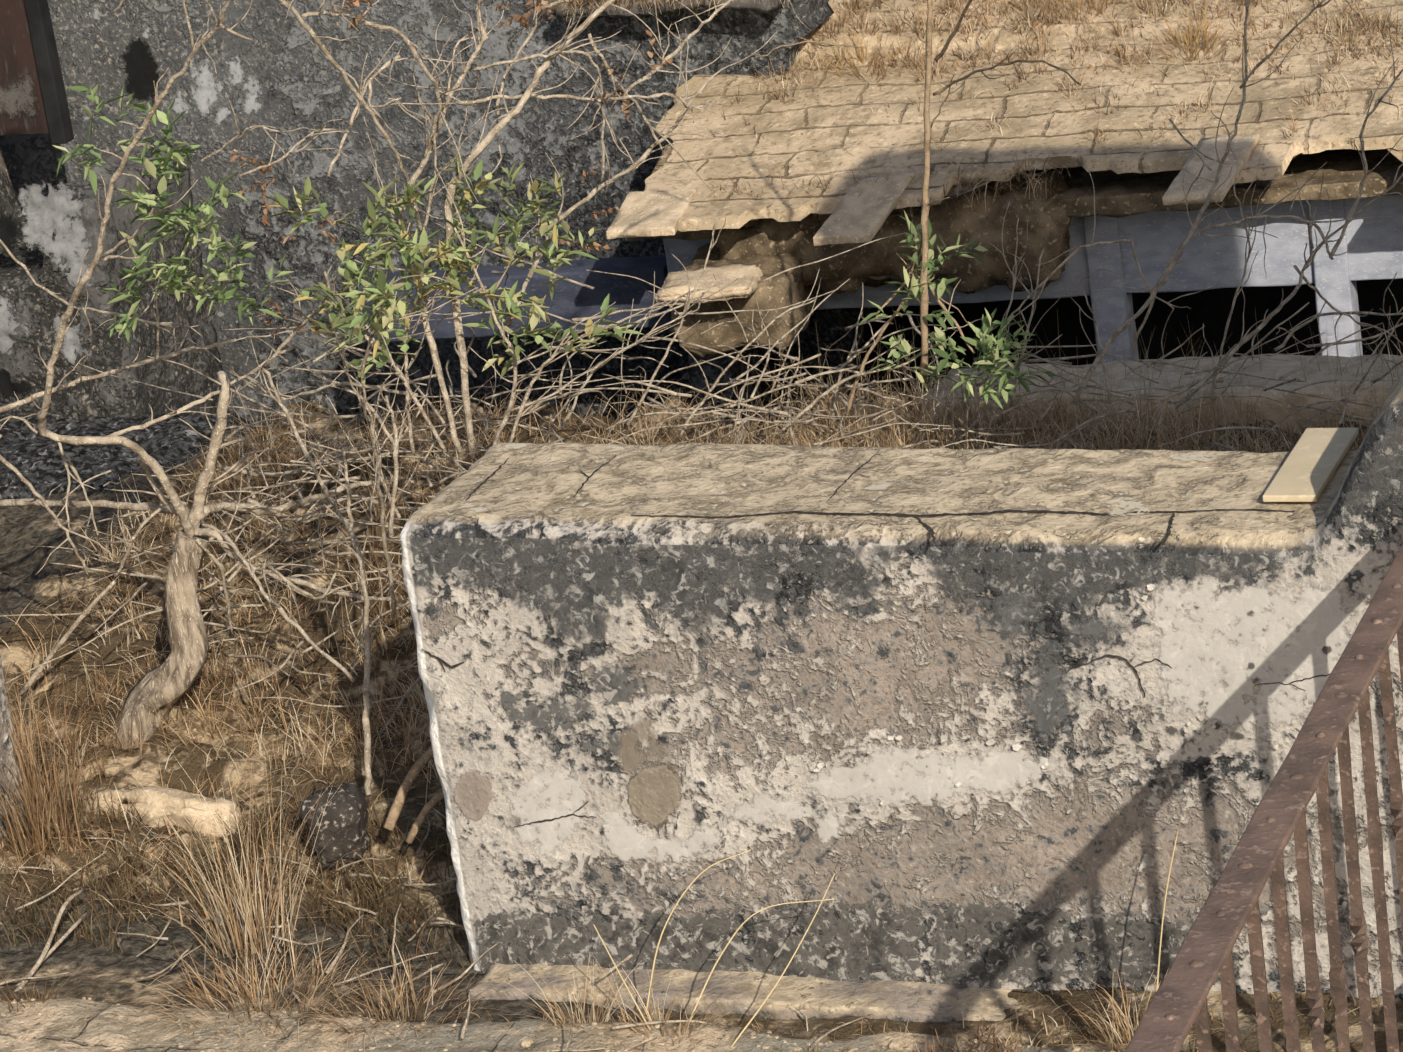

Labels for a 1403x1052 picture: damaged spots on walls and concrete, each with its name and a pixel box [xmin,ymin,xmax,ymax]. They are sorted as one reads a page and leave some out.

crack [631,451,1295,544]
water stain [410,537,1284,648]
water stain [499,661,638,755]
crack [1066,654,1172,698]
flaking render [454,721,1057,864]
water stain [474,898,1190,990]